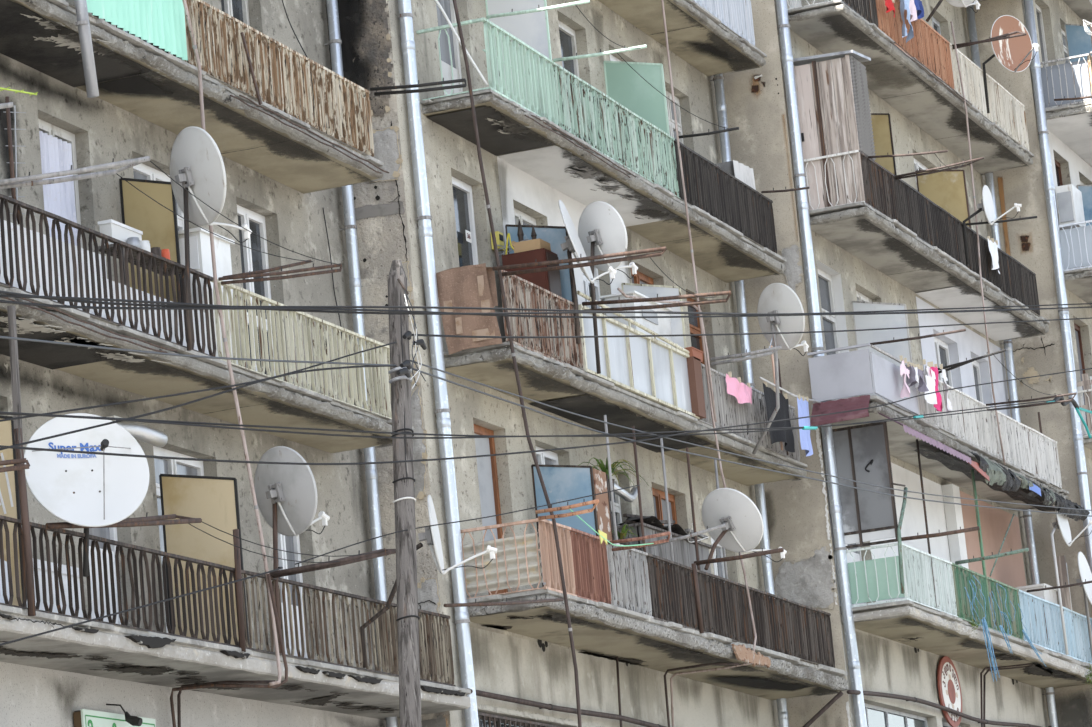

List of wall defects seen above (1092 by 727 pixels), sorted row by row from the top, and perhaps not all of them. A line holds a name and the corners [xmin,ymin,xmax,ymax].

damp [487,106,779,275]
peeling [0,294,178,363]
damp [856,219,1045,339]
flaking render [774,428,838,610]